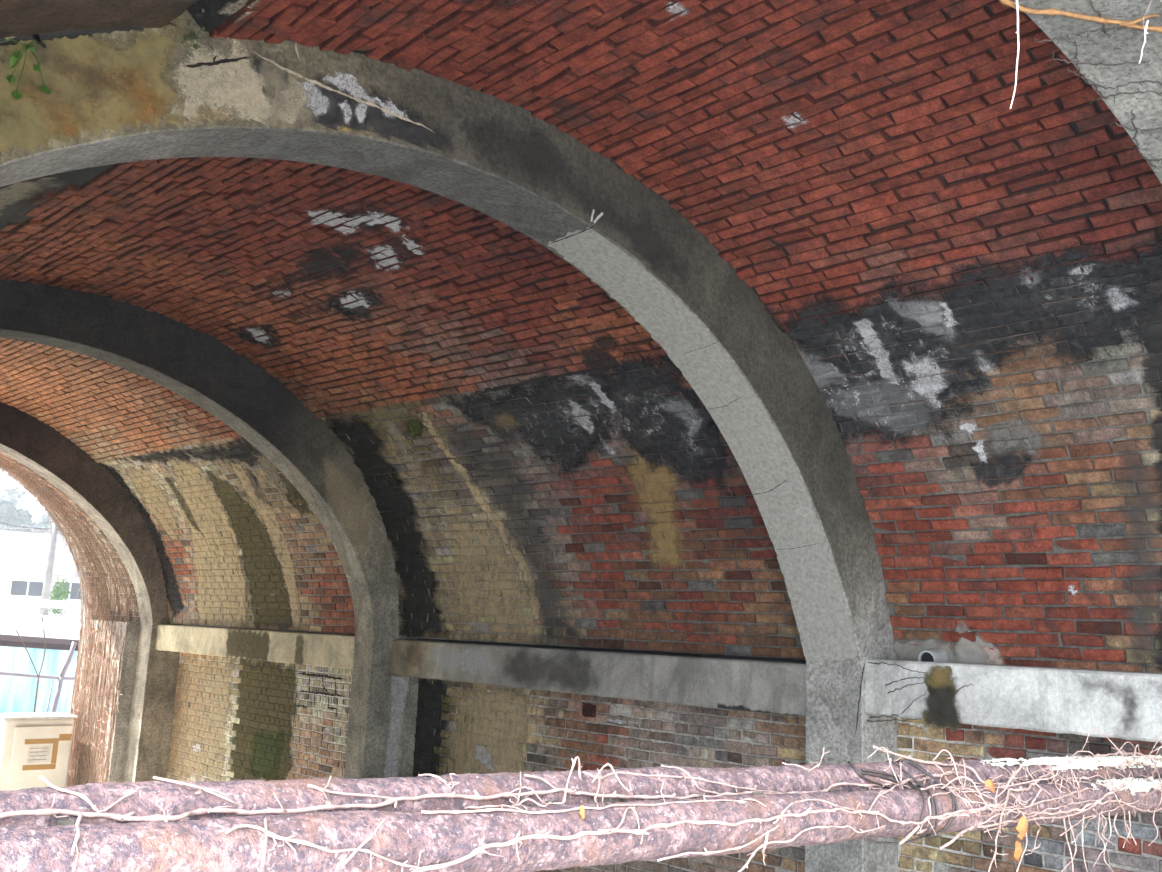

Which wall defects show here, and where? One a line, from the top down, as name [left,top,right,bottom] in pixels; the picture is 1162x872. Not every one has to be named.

crack [0,23,178,48]
peeling [162,39,307,125]
peeling [327,73,404,136]
water stain [569,400,593,431]
water stain [589,382,614,413]
water stain [856,320,945,402]
water stain [1120,296,1162,672]
water stain [328,412,589,777]